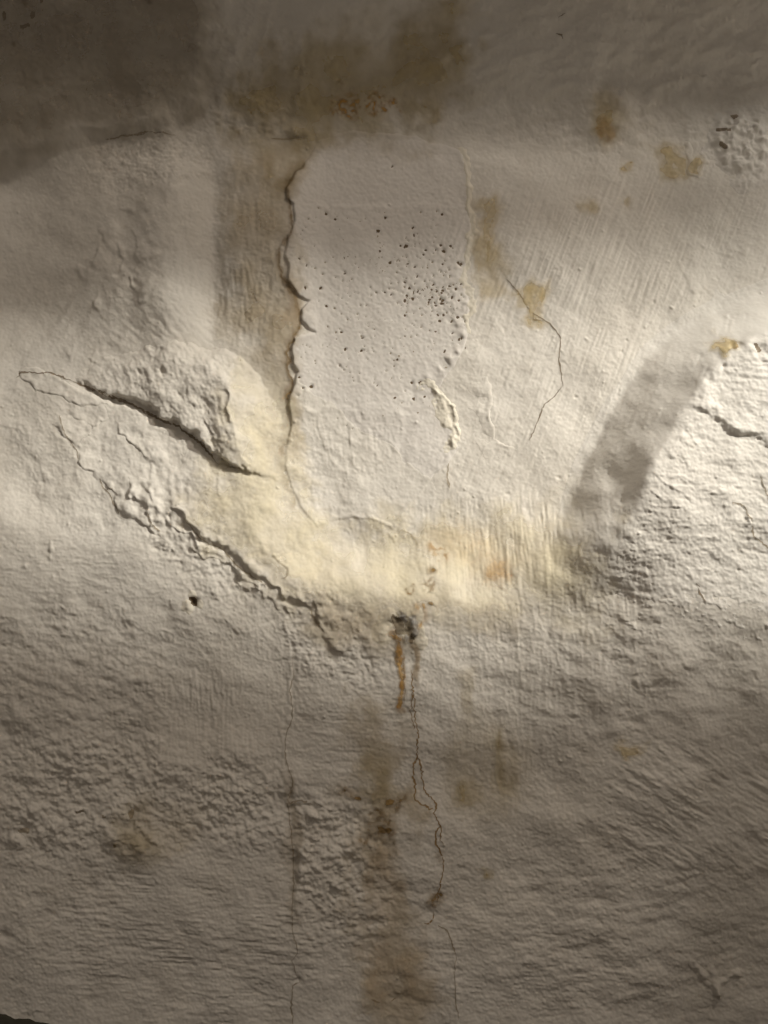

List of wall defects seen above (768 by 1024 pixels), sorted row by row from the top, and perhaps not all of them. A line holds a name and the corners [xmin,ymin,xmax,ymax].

damp [0,0,200,145]
crack [507,280,563,438]
damp [242,423,294,557]
damp [373,528,473,605]
damp [513,532,574,586]
corrosion [391,634,419,709]
crack [409,672,459,1017]